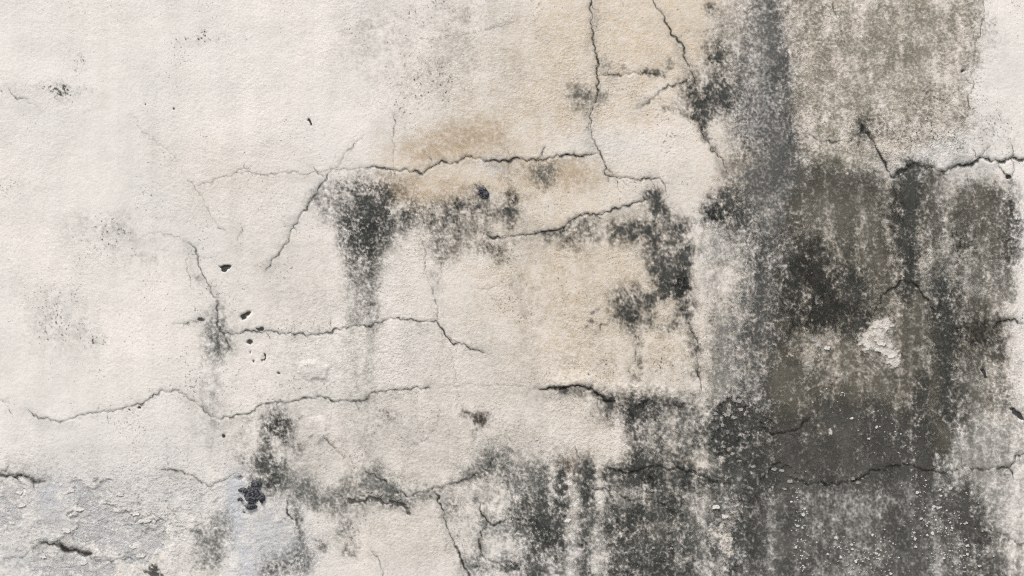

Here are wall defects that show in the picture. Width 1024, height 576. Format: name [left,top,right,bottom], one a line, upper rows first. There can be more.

crack [236,0,696,268]
crack [809,123,1024,201]
leakage [314,176,518,278]
crack [186,246,484,353]
leakage [492,0,1023,576]
crack [878,280,935,324]
crack [539,384,689,420]
crack [0,469,45,483]
crack [364,435,537,576]
crack [587,465,728,523]
crack [794,455,1021,486]
crack [6,542,132,562]